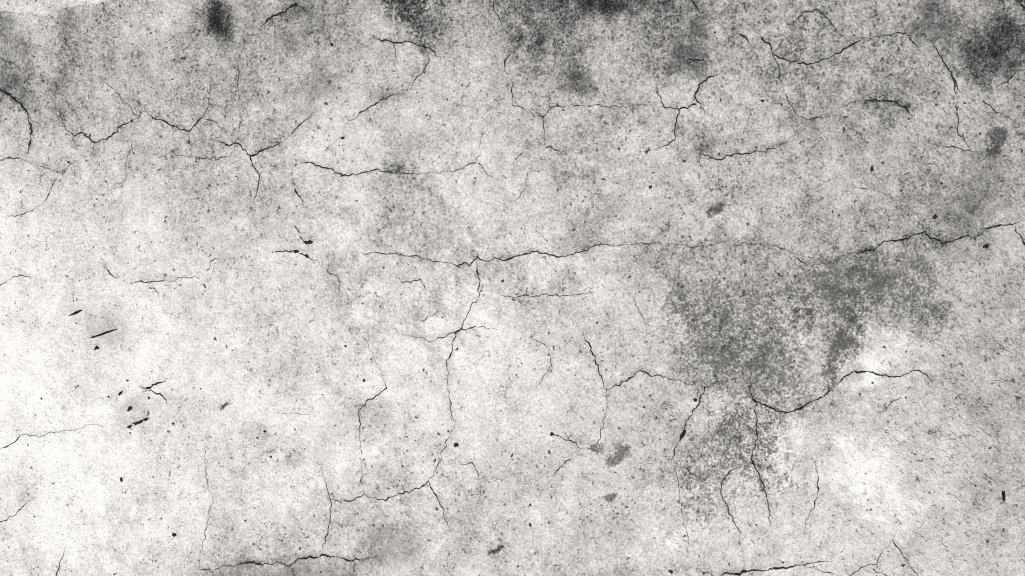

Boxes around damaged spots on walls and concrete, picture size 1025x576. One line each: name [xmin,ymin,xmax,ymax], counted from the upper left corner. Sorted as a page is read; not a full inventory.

crack [0,59,312,216]
crack [261,5,305,26]
crack [275,131,486,289]
crack [346,39,436,121]
crack [493,1,718,199]
crack [702,8,983,176]
crack [199,221,1025,576]